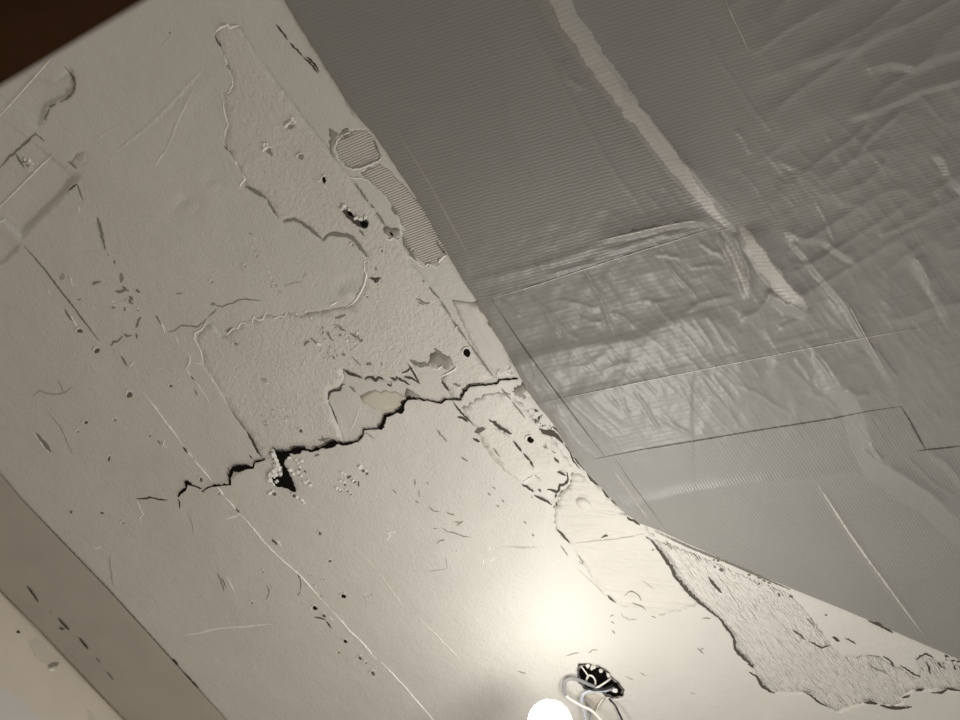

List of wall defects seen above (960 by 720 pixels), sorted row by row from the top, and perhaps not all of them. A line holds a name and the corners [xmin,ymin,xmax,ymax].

flaking render [186,24,572,498]
crack [138,315,775,693]
flaking render [652,540,960,712]